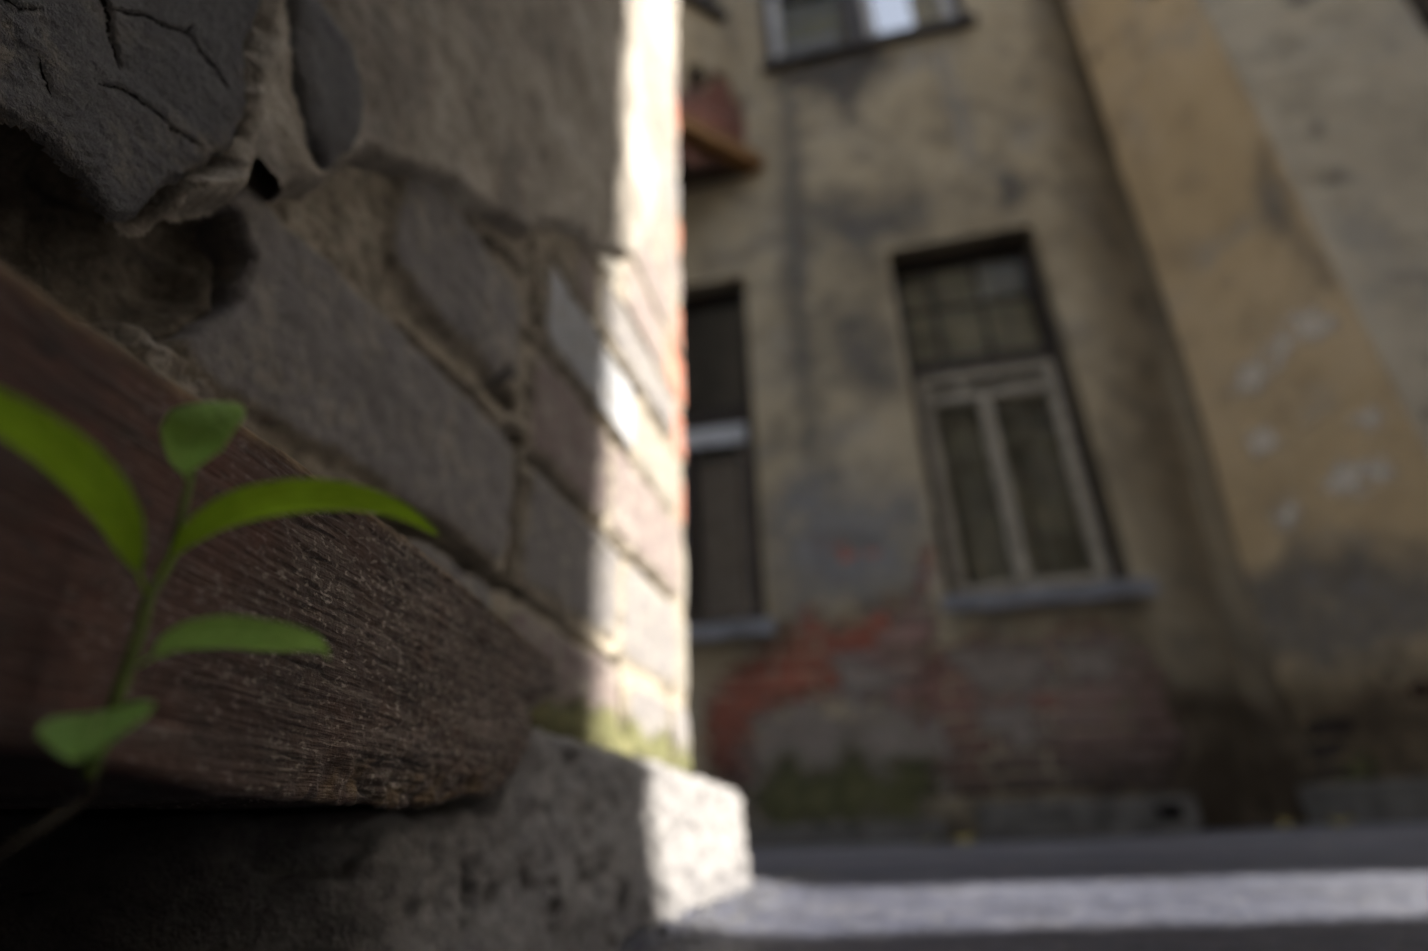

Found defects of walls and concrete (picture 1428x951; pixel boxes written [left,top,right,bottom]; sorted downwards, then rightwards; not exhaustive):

crack [5,0,41,11]
crack [38,57,52,97]
crack [98,0,227,147]
water stain [1245,551,1428,668]